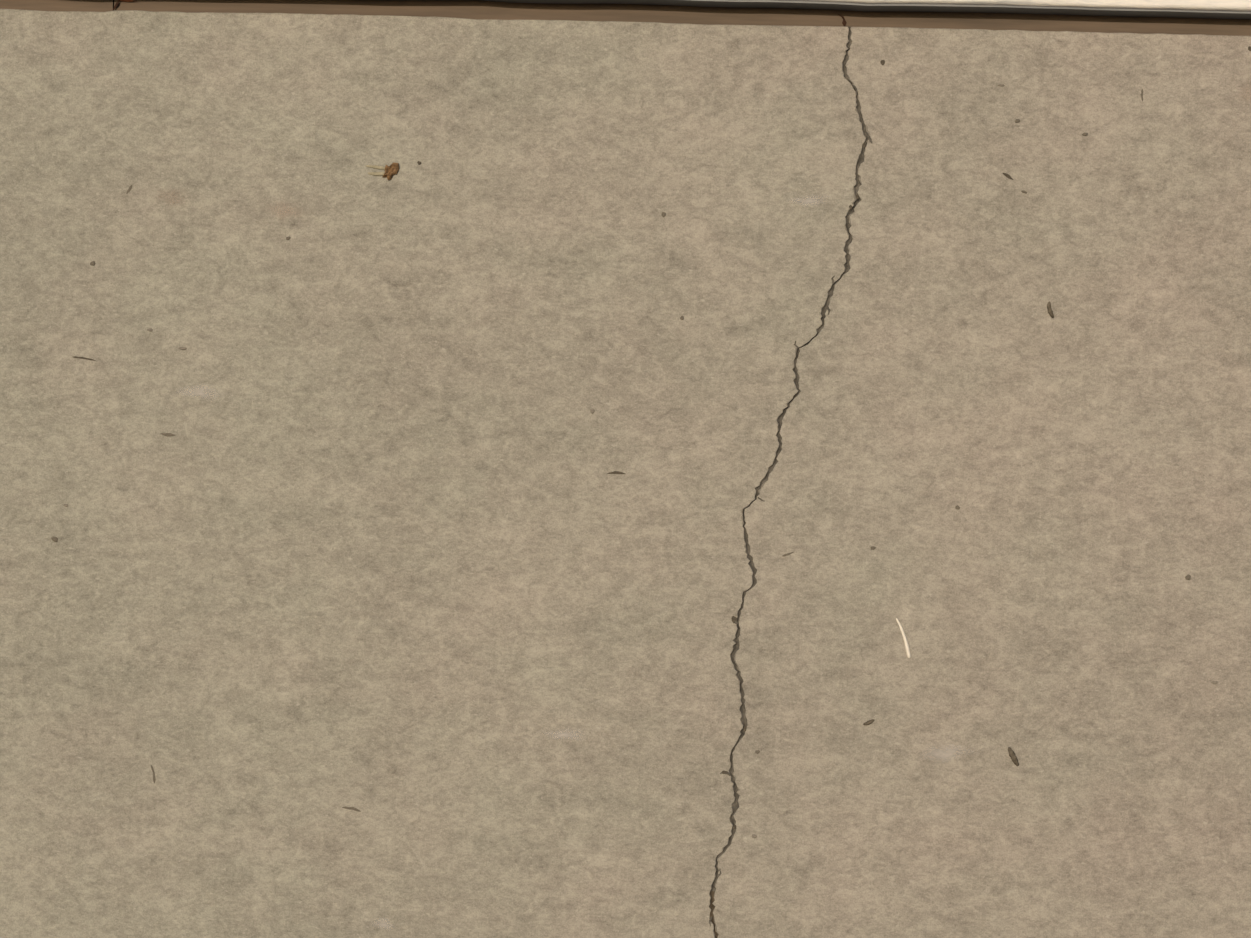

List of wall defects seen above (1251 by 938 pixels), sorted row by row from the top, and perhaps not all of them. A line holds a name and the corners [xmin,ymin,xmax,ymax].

crack [708,14,872,938]